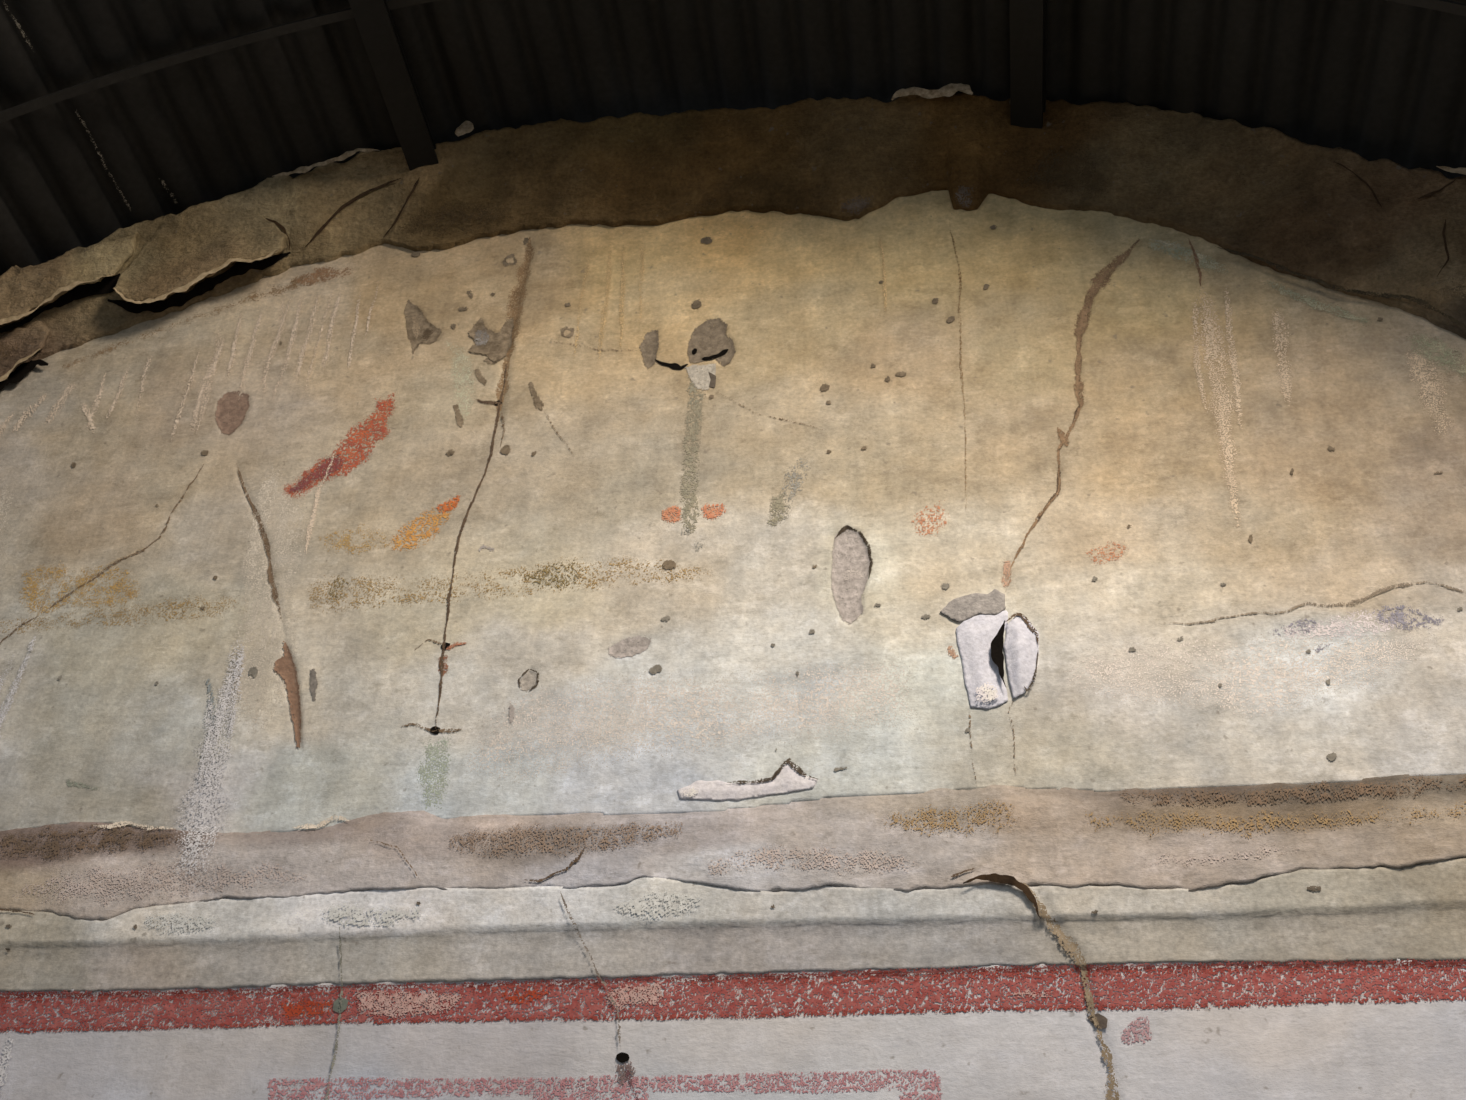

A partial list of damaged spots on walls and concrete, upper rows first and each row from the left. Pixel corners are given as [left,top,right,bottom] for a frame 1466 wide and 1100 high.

damp [891,83,973,100]
damp [1436,166,1466,175]
spalling [404,290,514,386]
spalling [687,299,736,399]
crack [1002,240,1139,587]
damp [1148,239,1243,533]
damp [1405,333,1466,436]
crack [401,238,534,734]
crack [0,464,302,748]
spalling [812,525,881,624]
peeling [1003,615,1039,699]
crack [951,868,1120,1100]